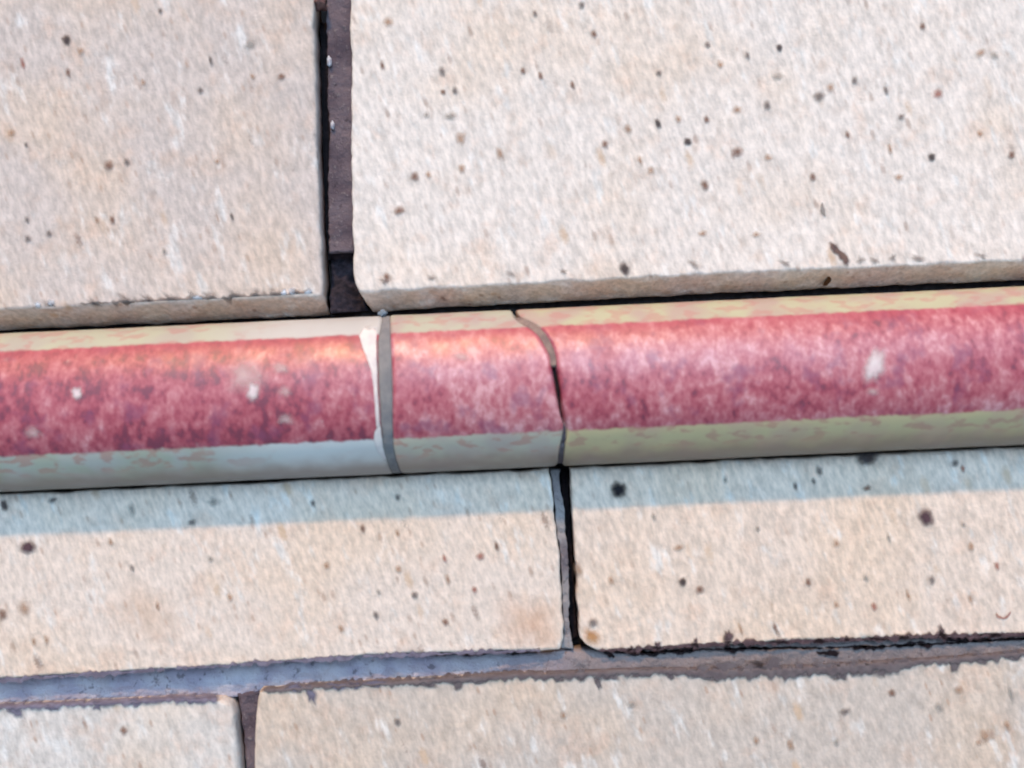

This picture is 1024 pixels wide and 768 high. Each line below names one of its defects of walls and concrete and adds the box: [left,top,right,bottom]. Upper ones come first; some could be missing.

peeling [359,327,386,460]
crack [430,316,578,657]